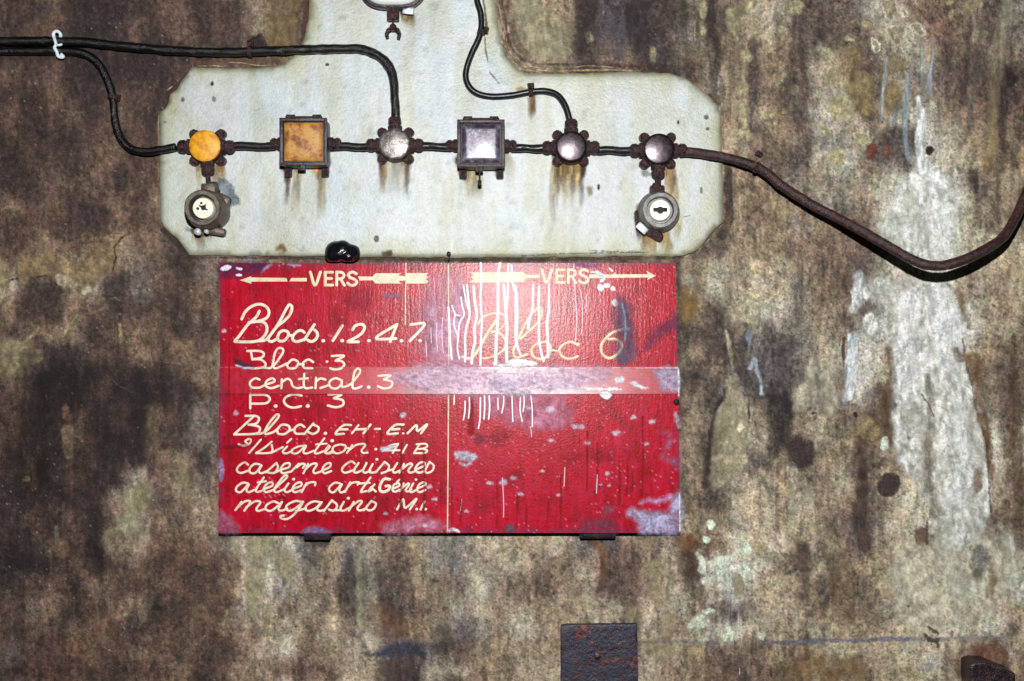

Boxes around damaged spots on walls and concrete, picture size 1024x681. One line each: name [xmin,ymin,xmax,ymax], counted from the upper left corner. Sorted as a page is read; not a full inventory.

rust [196,164,225,180]
rust [282,166,330,197]
rust [377,152,409,185]
rust [455,158,479,186]
rust [551,155,591,196]
rust [665,167,678,201]
efflorescence [874,39,958,261]
rust [634,206,680,250]
damp [775,399,815,467]
damp [842,271,1016,630]